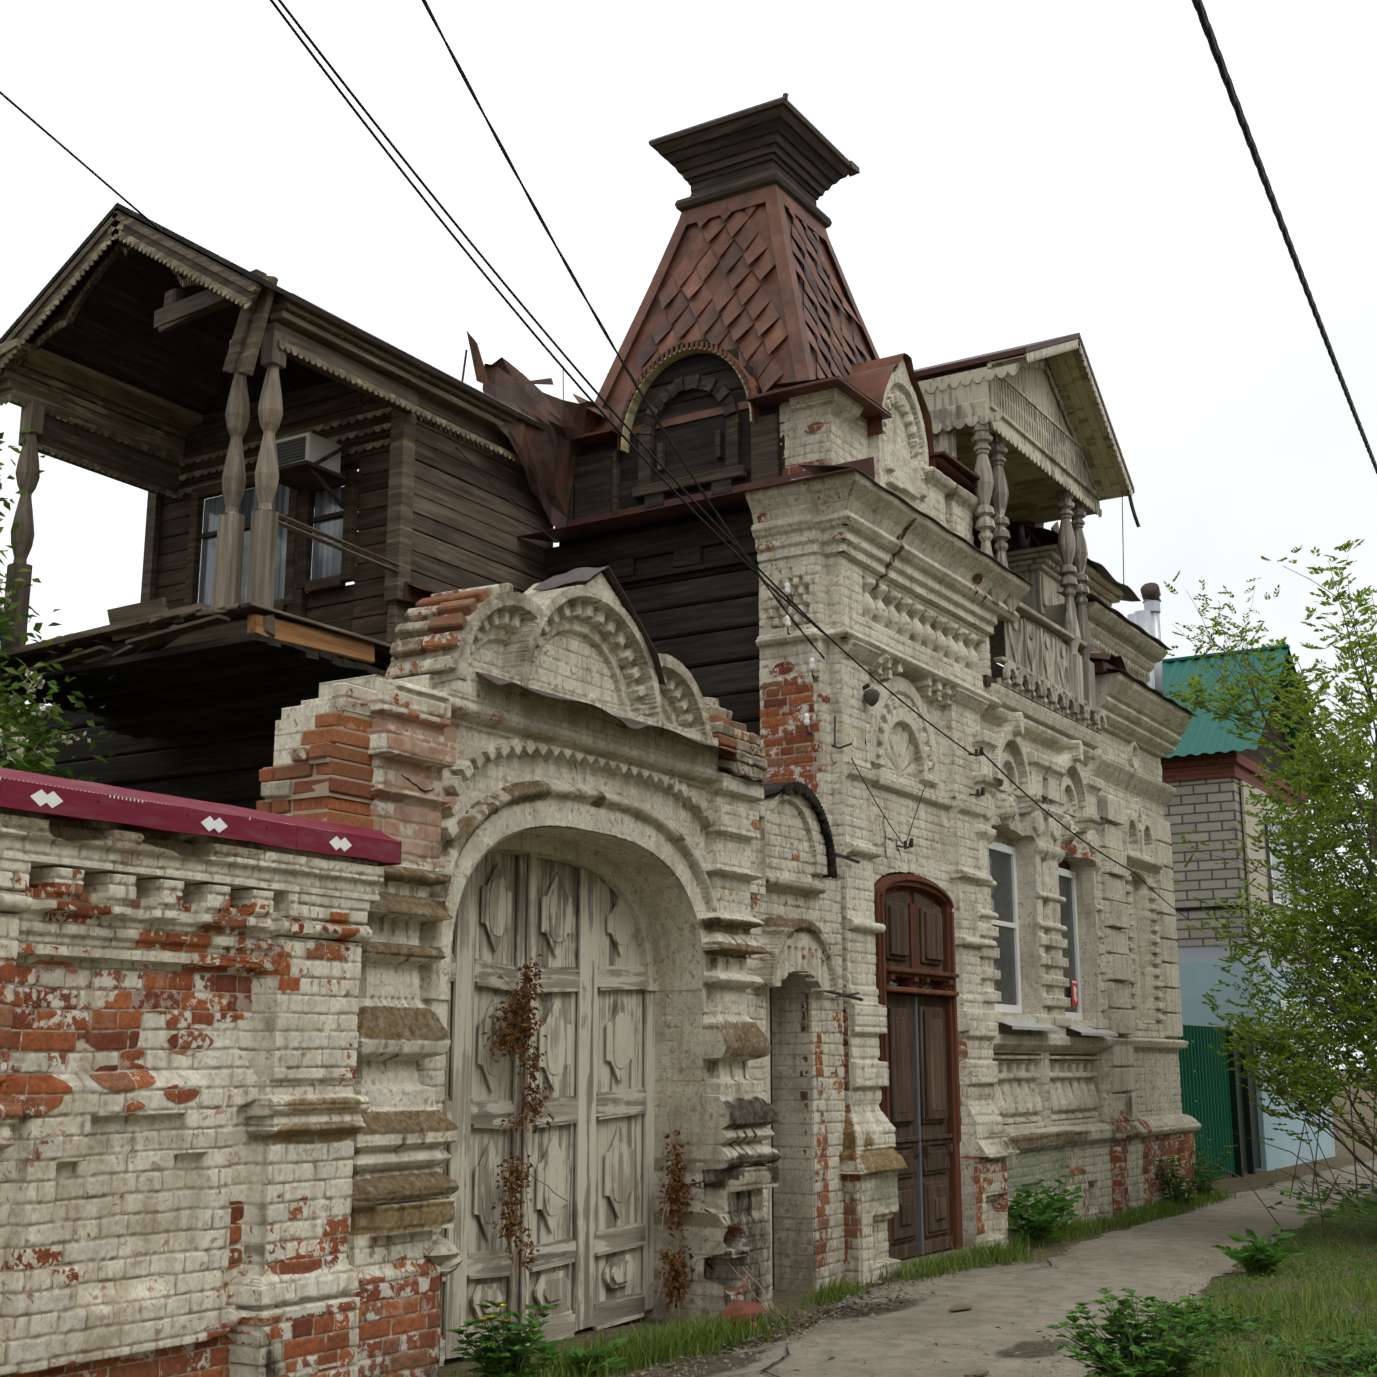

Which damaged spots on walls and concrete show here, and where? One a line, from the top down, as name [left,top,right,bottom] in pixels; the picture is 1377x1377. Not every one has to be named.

peeling [336,698,506,868]
peeling [760,661,831,794]
peeling [321,924,358,937]
peeling [0,919,304,1120]
peeling [813,1032,854,1278]
peeling [1109,1109,1197,1219]
peeling [2,1249,441,1377]